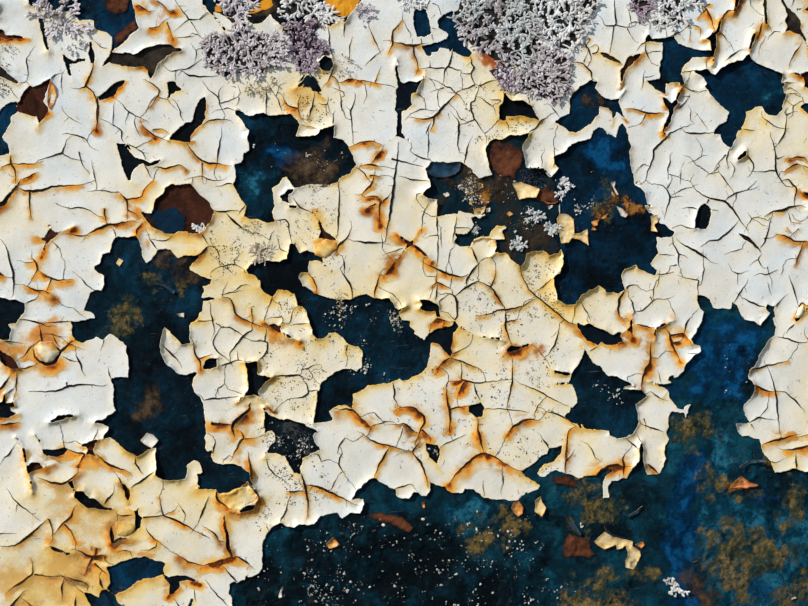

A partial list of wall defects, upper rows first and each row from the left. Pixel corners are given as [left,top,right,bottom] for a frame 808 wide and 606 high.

corrosion [23,226,81,306]
peeling [71,236,253,494]
peeling [247,243,465,474]
corrosion [359,175,435,283]
crack [164,0,663,529]
corrosion [442,376,523,493]
peeling [229,295,808,606]
peeling [423,80,674,305]
corrosion [574,313,694,391]
crack [577,0,780,86]
crack [615,45,808,468]
peeling [694,31,786,148]